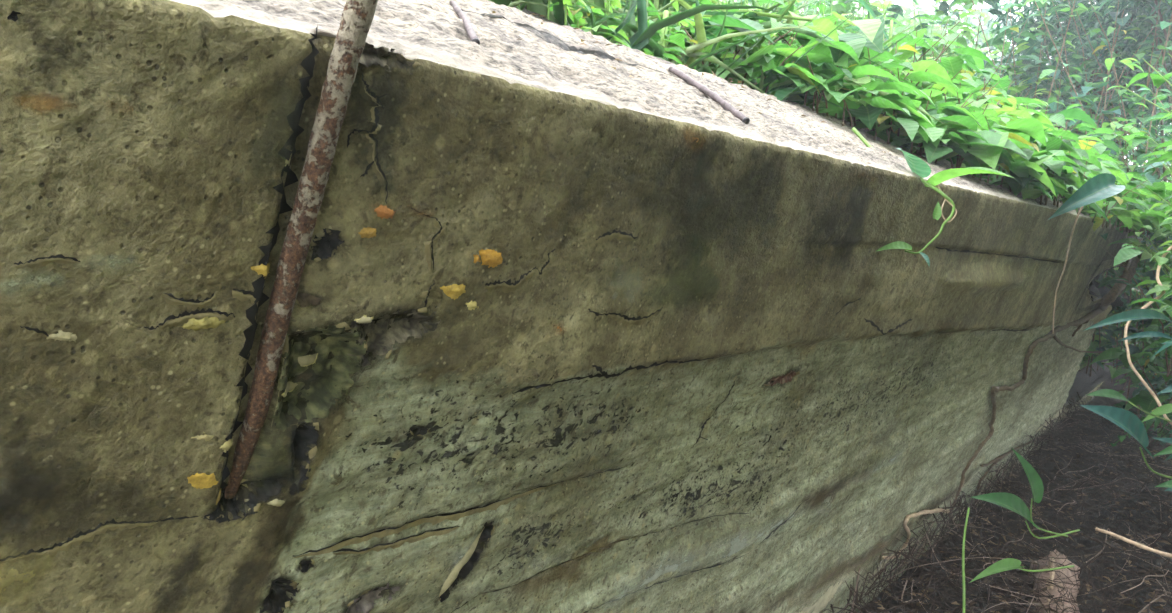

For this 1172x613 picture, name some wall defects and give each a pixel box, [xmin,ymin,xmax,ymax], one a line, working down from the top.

crack [347,73,445,308]
crack [14,254,80,269]
crack [143,25,319,490]
crack [588,307,663,327]
crack [836,298,912,339]
crack [512,354,736,447]
crack [0,516,198,564]